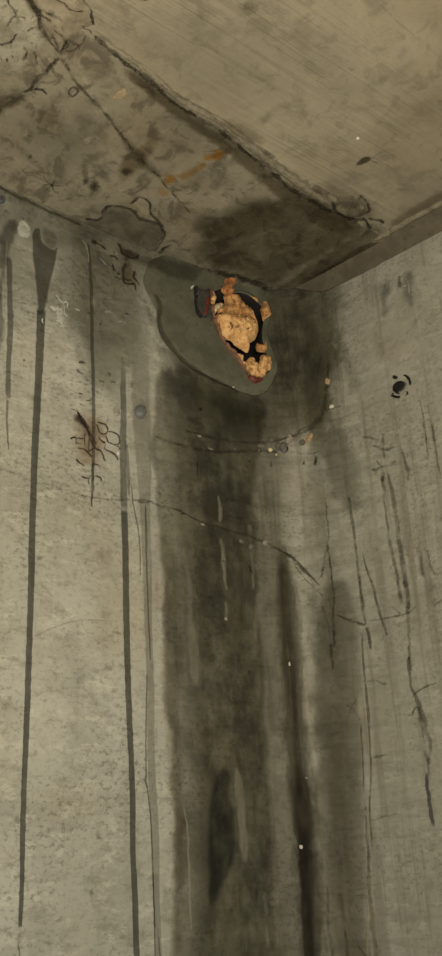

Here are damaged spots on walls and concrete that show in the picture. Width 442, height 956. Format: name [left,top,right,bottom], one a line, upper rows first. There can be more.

crack [0,0,384,253]
leakage [18,221,31,238]
crack [363,436,409,481]
leakage [133,375,162,956]
crack [408,657,437,715]
leakage [300,825,317,956]